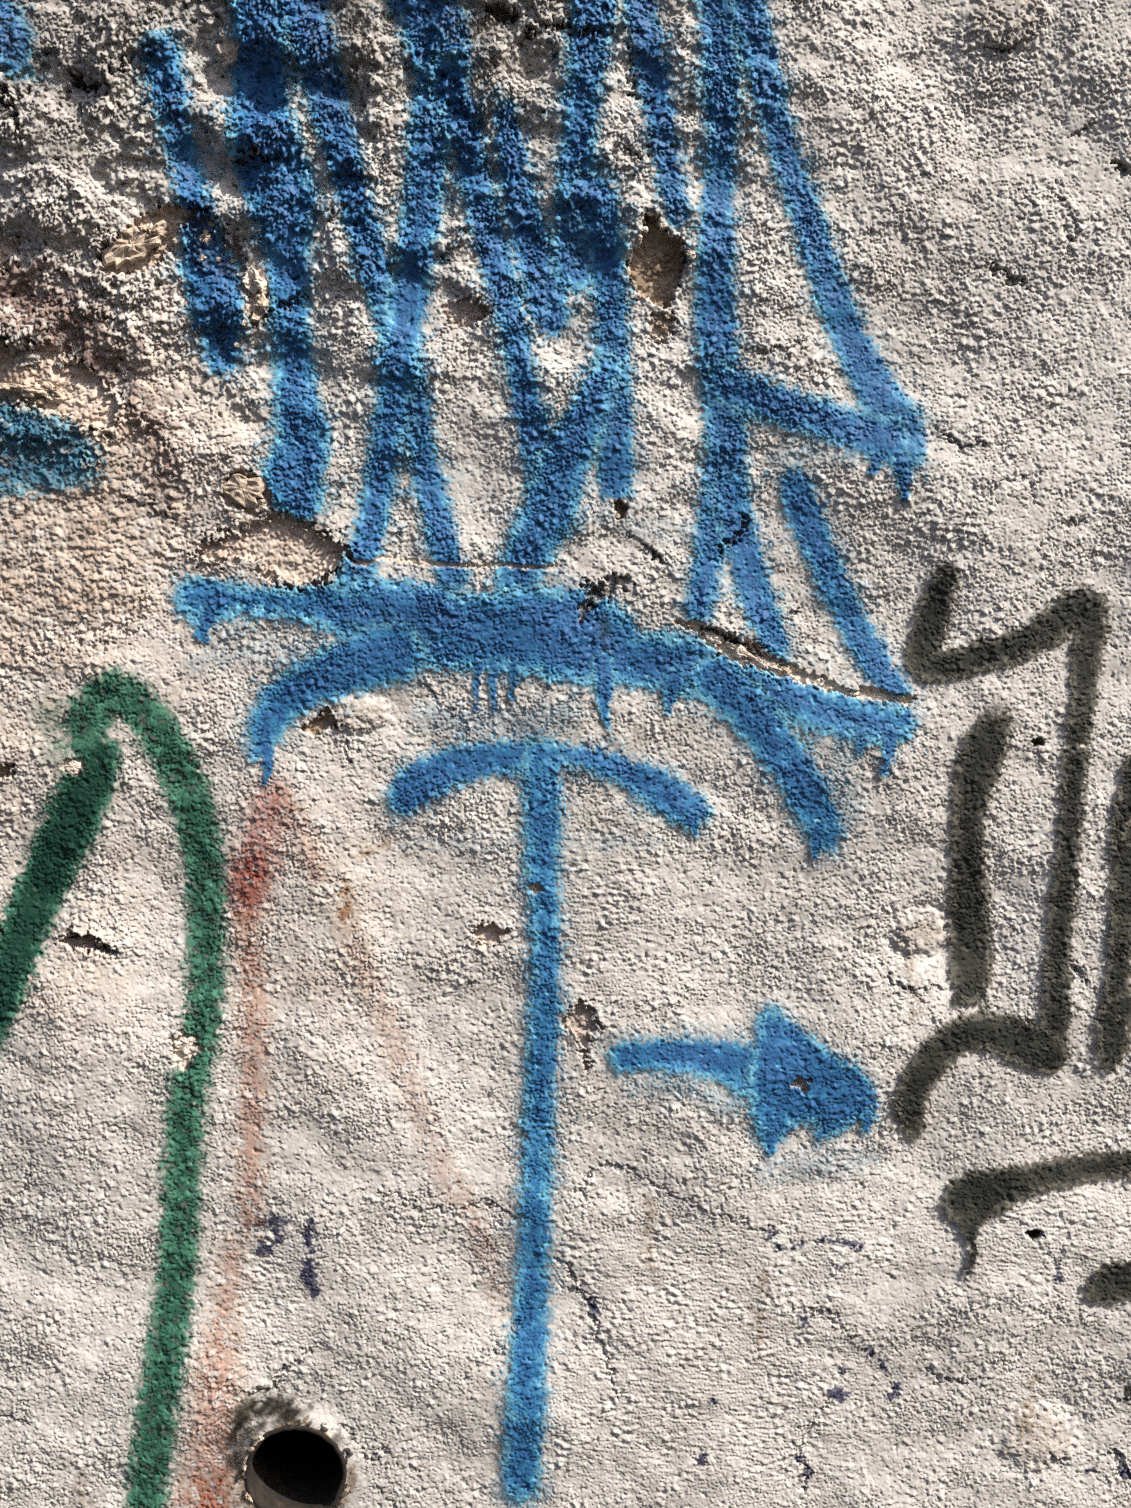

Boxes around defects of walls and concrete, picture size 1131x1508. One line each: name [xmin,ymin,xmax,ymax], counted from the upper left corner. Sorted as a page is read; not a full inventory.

spalling [625,209,696,346]
spalling [472,920,512,948]
peeling [561,998,604,1070]